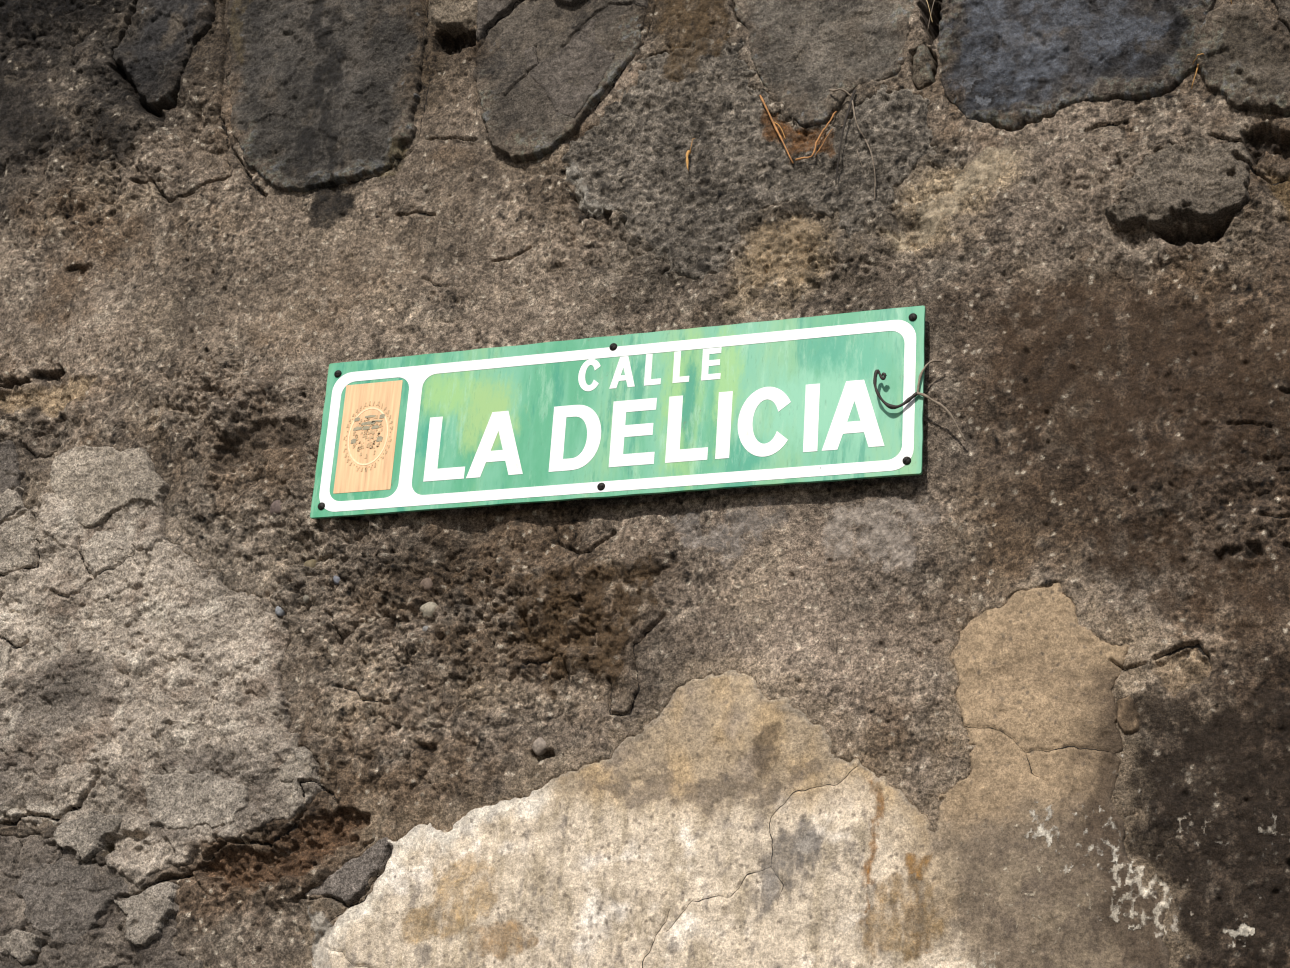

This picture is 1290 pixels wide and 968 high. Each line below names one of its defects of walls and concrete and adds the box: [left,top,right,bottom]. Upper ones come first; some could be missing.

crack [347,0,525,187]
crack [595,4,655,110]
flaking render [0,445,323,968]
flaking render [304,583,1170,968]
crack [642,766,858,968]
corrosion [864,834,875,884]
corrosion [906,854,928,880]
efflorescence [1015,806,1074,873]
leakage [1077,663,1290,968]